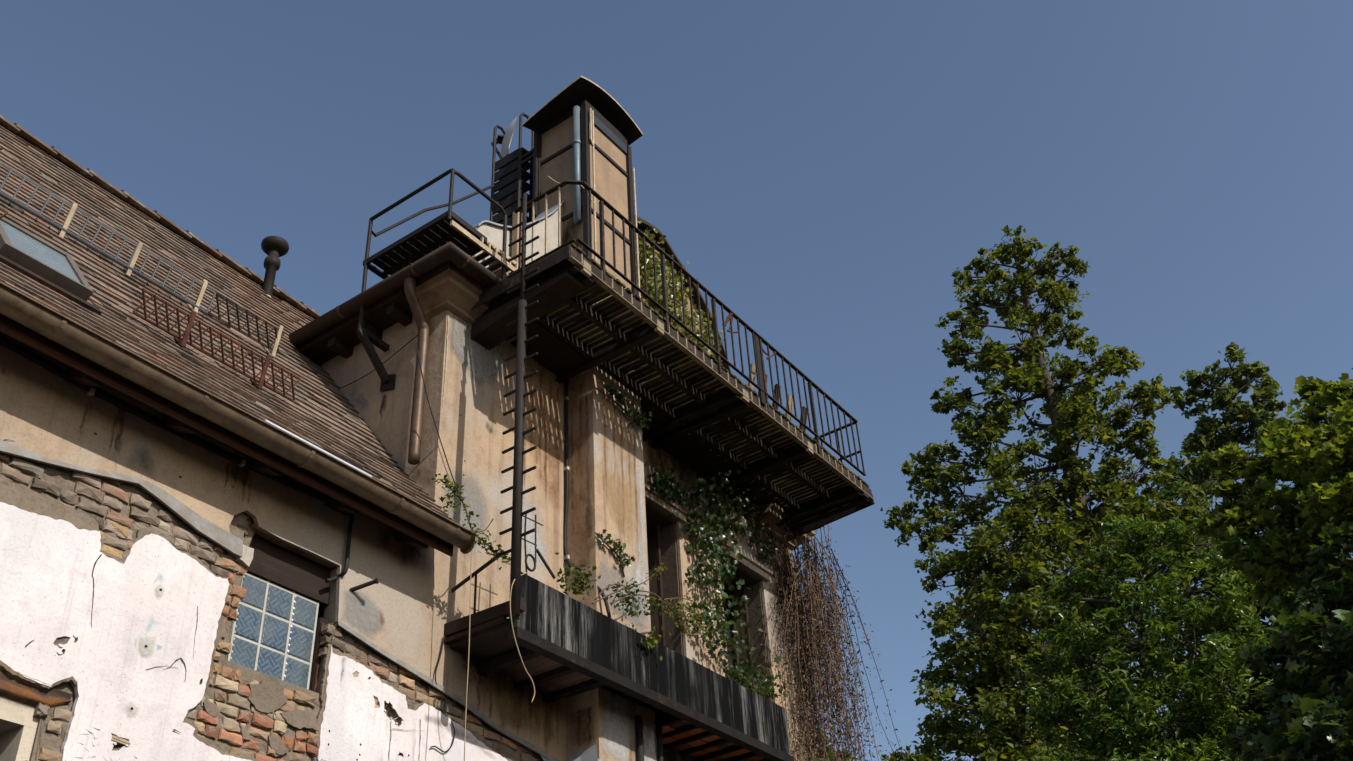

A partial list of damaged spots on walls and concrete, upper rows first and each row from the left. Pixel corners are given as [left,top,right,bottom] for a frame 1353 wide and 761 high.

crack [91,554,102,625]
flaking render [0,452,330,761]
flaking render [318,624,544,761]